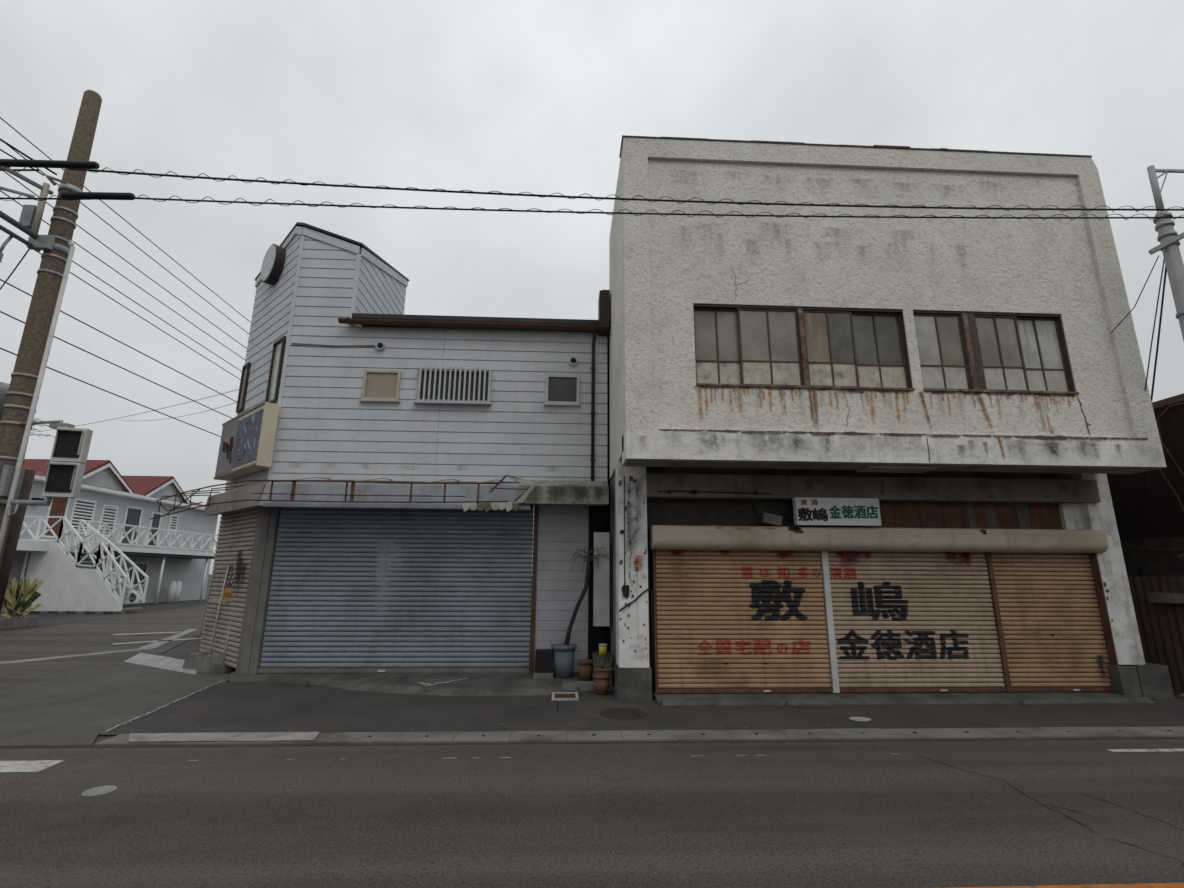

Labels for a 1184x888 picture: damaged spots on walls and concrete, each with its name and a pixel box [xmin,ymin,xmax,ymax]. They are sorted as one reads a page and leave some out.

corrosion [698,387,745,415]
corrosion [759,388,1073,426]